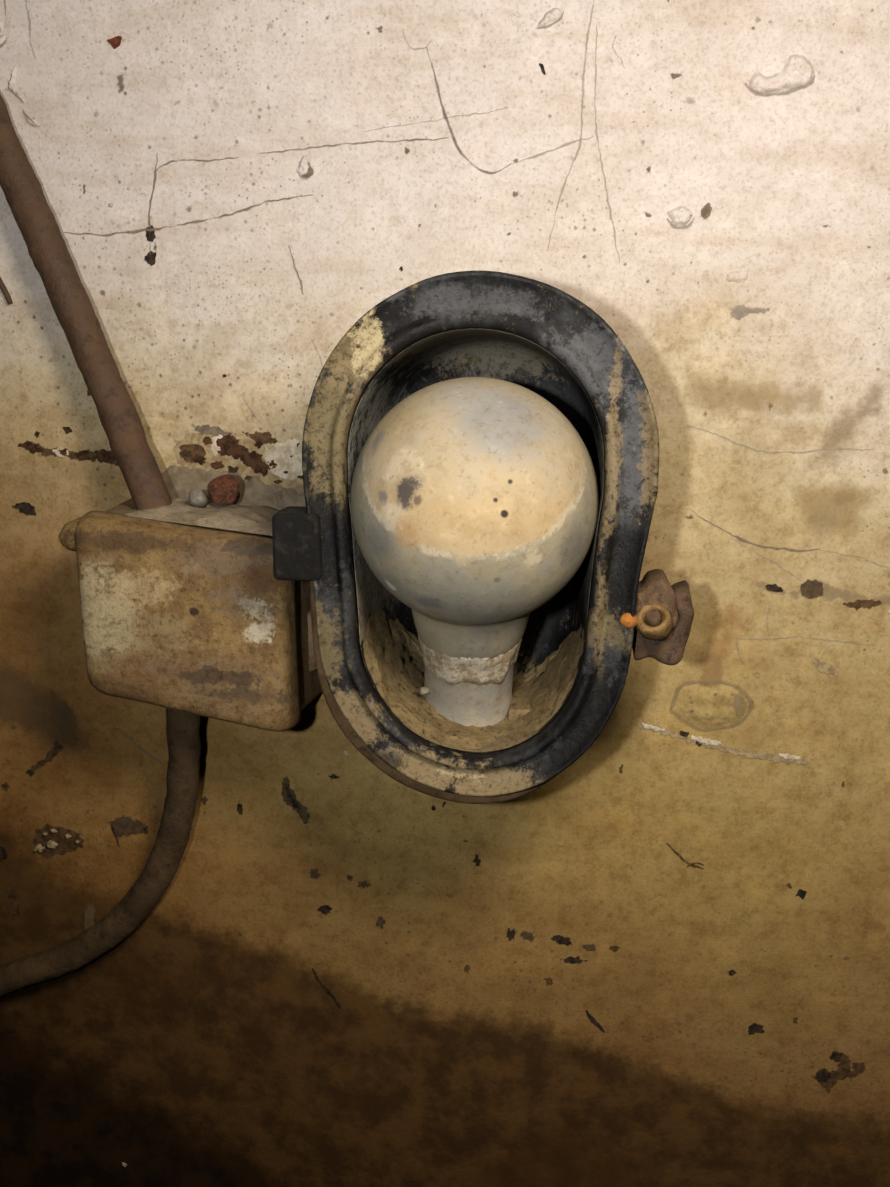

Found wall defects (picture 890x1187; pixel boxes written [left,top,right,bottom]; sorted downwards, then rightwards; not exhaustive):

crack [64,22,620,266]
peeling [174,425,304,489]
spalling [760,579,890,613]
spalling [34,824,84,858]
spalling [814,1051,865,1092]